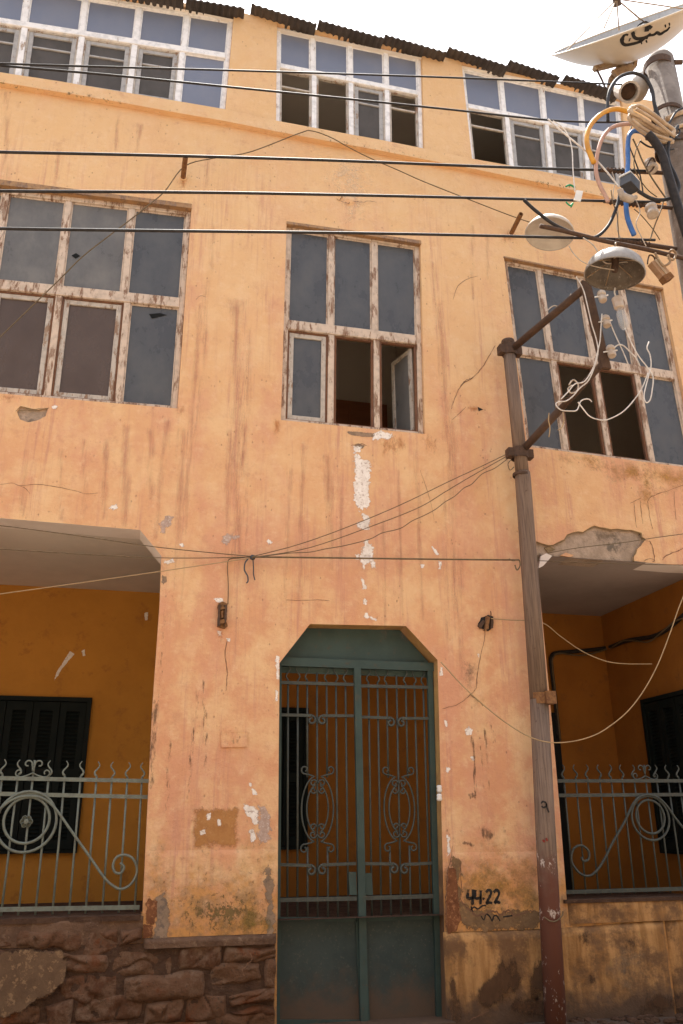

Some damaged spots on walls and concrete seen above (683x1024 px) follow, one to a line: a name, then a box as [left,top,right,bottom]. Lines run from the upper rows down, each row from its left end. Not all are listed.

flaking render [16,405,58,422]
peeling [347,430,393,621]
flaking render [536,526,645,568]
peeling [243,783,272,845]
leakage [181,893,256,930]
flaking render [445,835,540,934]
leakage [478,960,544,1017]